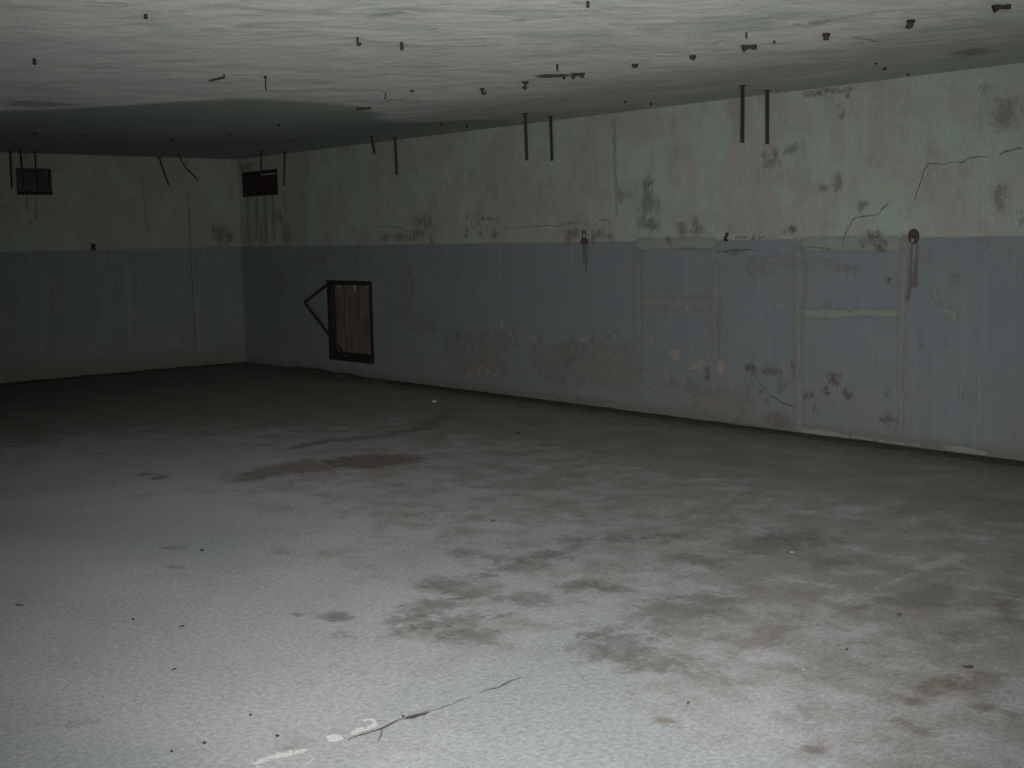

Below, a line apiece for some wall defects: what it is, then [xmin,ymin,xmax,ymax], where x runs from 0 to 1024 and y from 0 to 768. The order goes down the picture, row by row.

crack [914,148,1022,200]
crack [807,202,889,250]
crack [348,677,522,742]